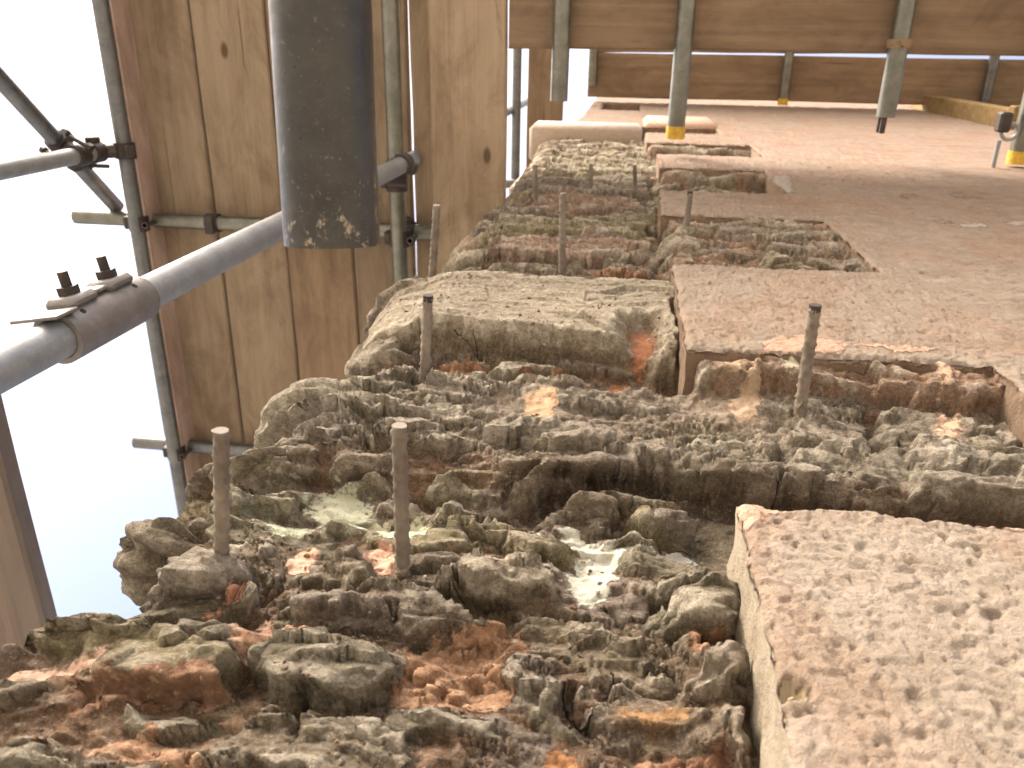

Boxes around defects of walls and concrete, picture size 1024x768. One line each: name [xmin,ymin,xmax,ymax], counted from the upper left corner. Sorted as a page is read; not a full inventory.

rust [608,327,661,393]
rust [523,386,559,418]
spalling [933,361,963,439]
spalling [286,547,321,575]
water stain [252,475,395,539]
spalling [362,540,396,576]
water stain [409,513,436,539]
water stain [558,527,626,609]
spalling [737,504,779,531]
spalling [201,581,310,667]
spalling [389,620,533,713]
spalling [7,645,236,768]